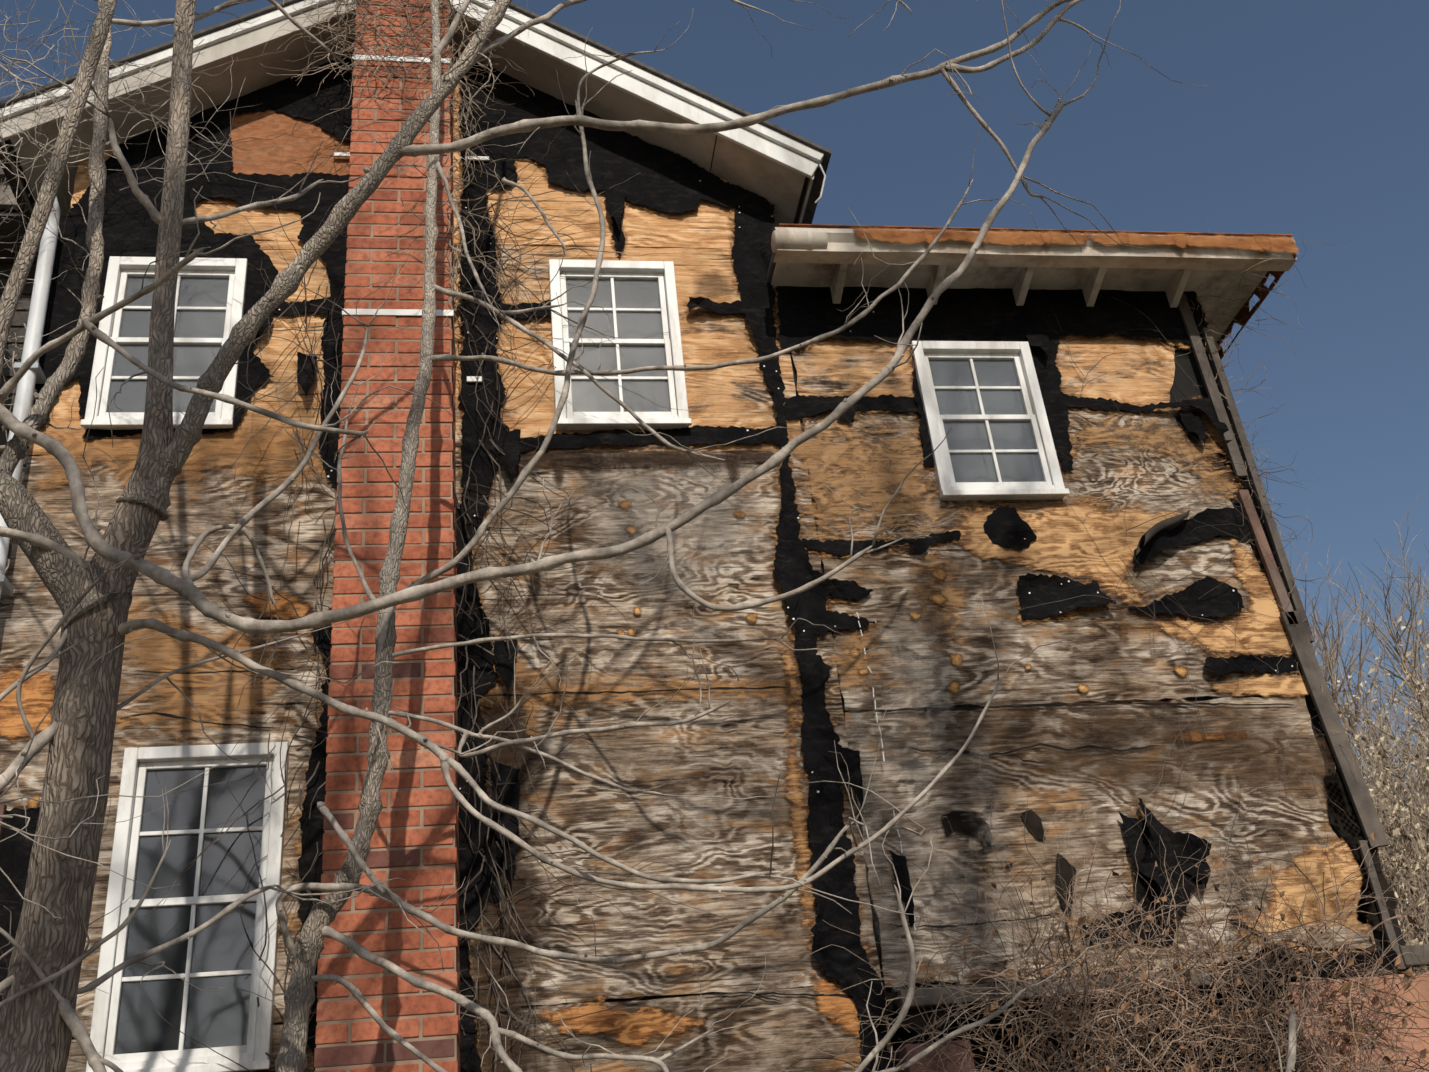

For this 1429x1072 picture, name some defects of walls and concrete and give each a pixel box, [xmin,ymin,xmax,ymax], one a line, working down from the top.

water stain [515,448,772,484]
peeling [944,509,974,538]
water stain [530,559,541,599]
water stain [480,696,547,813]
water stain [876,702,1346,811]
water stain [474,832,549,1072]